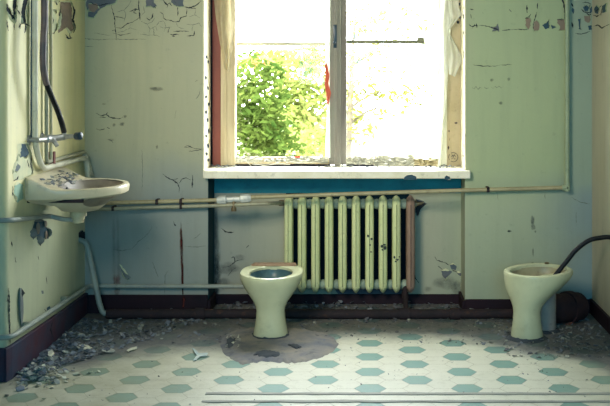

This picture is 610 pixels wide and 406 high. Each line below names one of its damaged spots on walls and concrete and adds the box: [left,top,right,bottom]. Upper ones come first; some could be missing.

peeling [53,0,76,39]
crack [85,0,202,47]
peeling [525,2,608,34]
peeling [12,142,34,203]
spalling [30,219,52,246]
peeling [435,257,461,281]